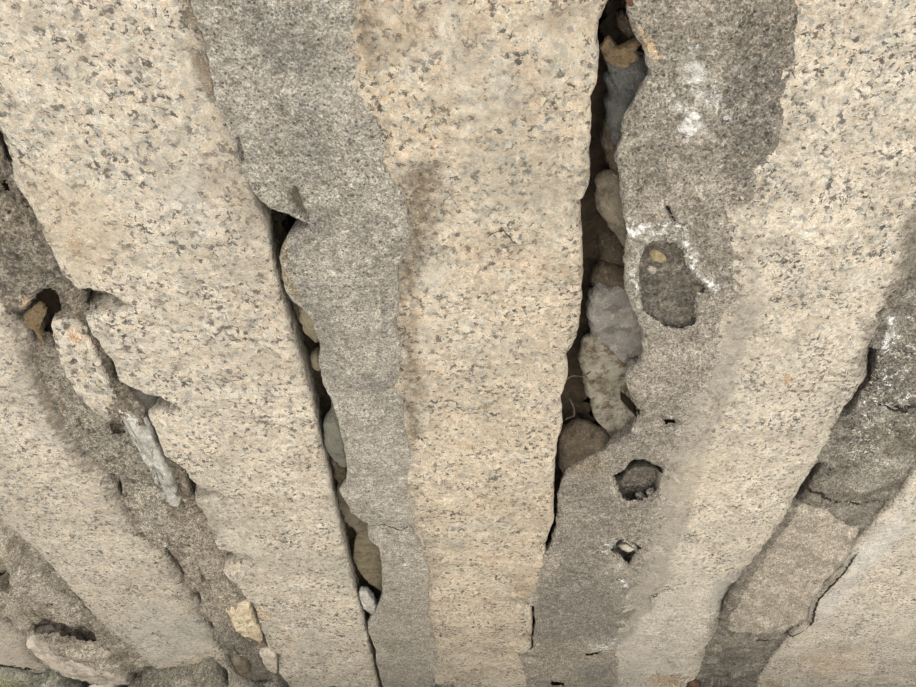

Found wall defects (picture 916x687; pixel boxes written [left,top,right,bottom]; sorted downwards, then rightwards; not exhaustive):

leakage [681,110,701,136]
crack [271,209,290,251]
crack [548,0,643,536]
spalling [638,241,705,329]
crack [299,322,331,423]
spalling [614,459,662,501]
crack [803,481,880,505]
crack [344,521,410,591]
crack [756,553,858,641]